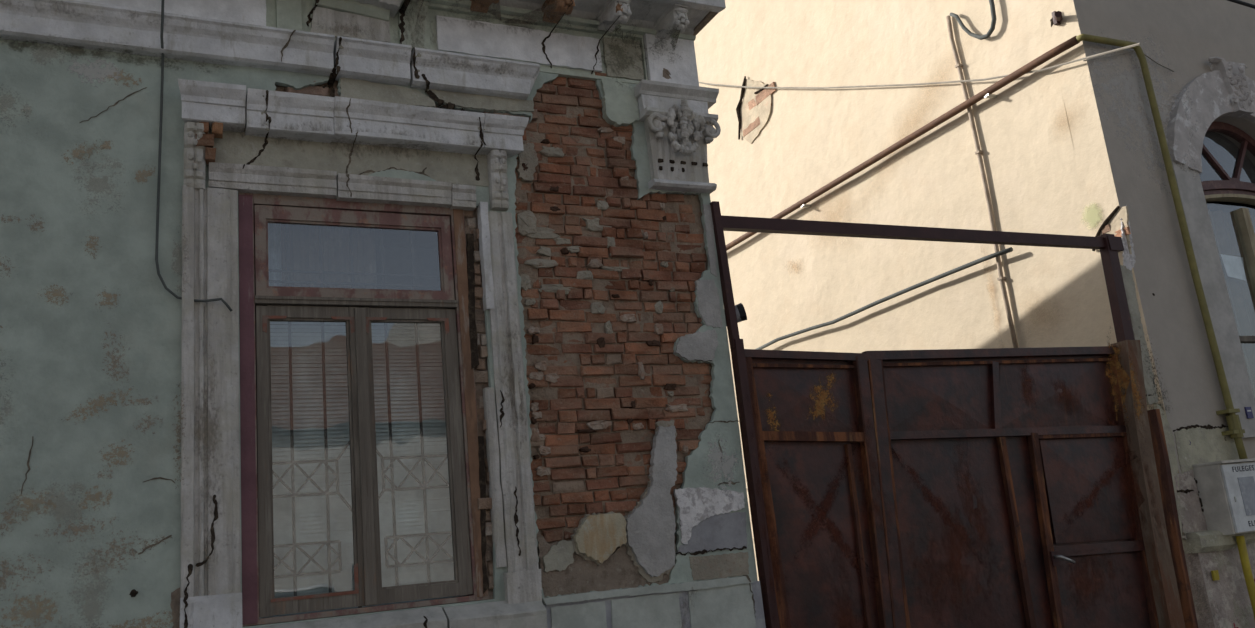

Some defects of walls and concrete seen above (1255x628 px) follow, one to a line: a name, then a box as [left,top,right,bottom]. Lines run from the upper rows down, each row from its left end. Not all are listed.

crack [243,90,271,168]
crack [281,0,319,62]
crack [322,37,429,197]
crack [398,0,486,181]
crack [21,437,33,495]
peeling [37,441,166,577]
peeling [67,332,186,482]
peeling [99,588,242,628]
crack [183,495,218,628]
spalling [464,208,494,600]
spalling [478,72,749,597]
spalling [1092,205,1239,540]